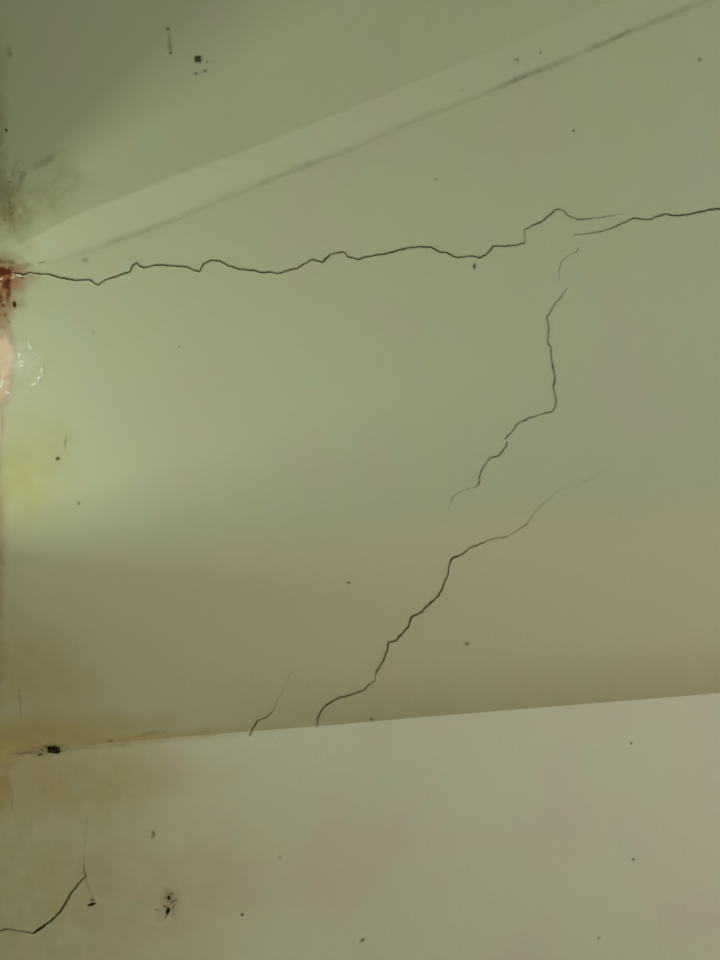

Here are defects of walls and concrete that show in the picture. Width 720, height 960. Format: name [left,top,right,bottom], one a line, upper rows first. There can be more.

crack [13,207,720,287]
rust [0,260,23,316]
crack [478,306,557,486]
crack [317,537,503,722]
crack [0,875,86,934]